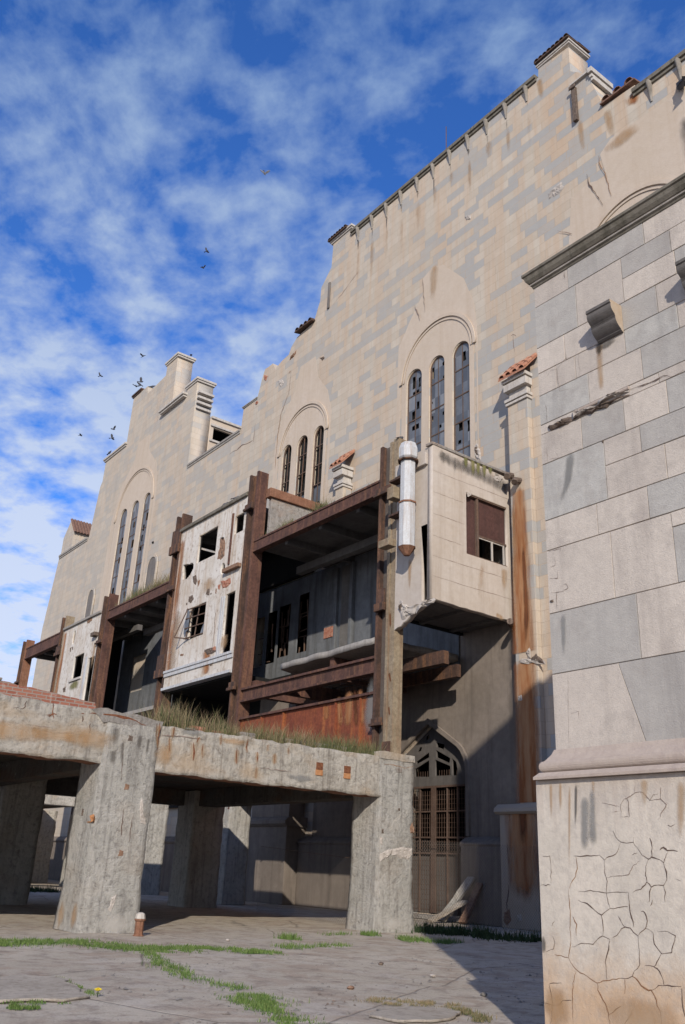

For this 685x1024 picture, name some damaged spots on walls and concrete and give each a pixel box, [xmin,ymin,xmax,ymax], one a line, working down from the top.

crack [587,155,611,205]
damp [564,456,573,491]
spalling [186,575,231,605]
rust [324,688,373,725]
rust [497,489,539,895]
damp [575,787,595,844]
spalling [379,829,412,861]
crack [543,788,685,1023]